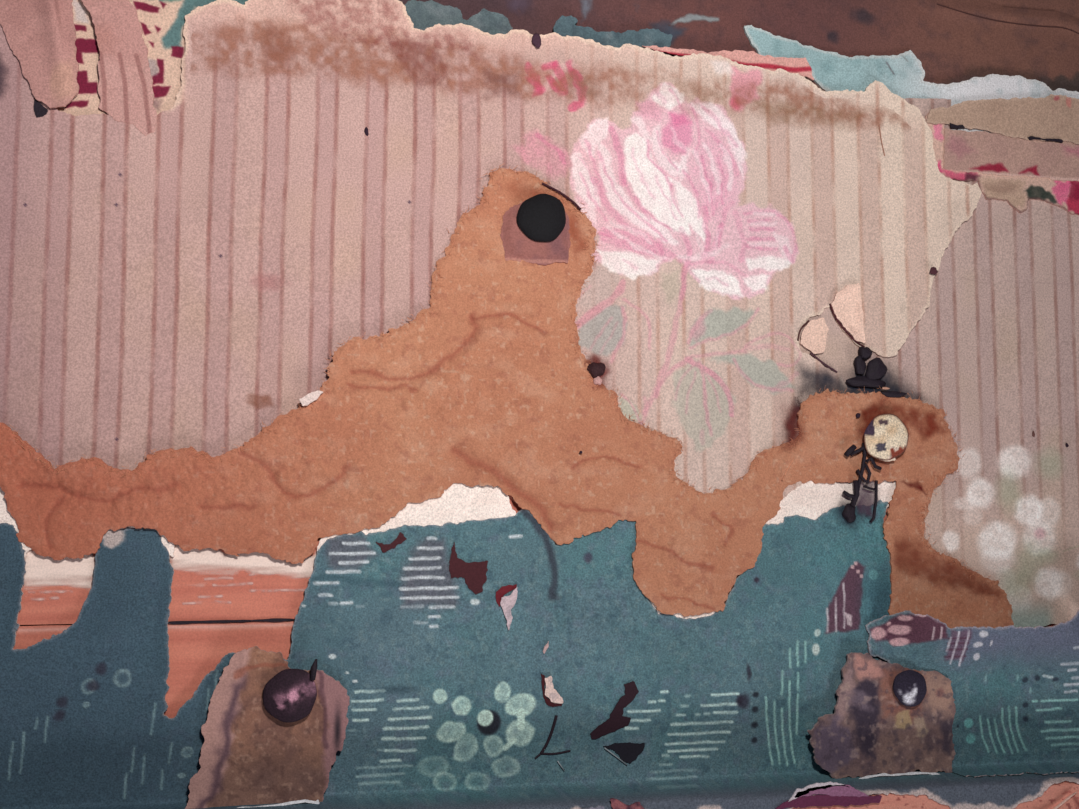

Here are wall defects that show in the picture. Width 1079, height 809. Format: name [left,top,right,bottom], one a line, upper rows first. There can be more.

peeling [0,0,157,136]
peeling [800,283,866,354]
peeling [299,391,323,406]
peeling [24,551,95,600]
peeling [170,546,317,604]
peeling [500,588,518,630]
peeling [587,798,644,809]
peeling [788,781,869,802]